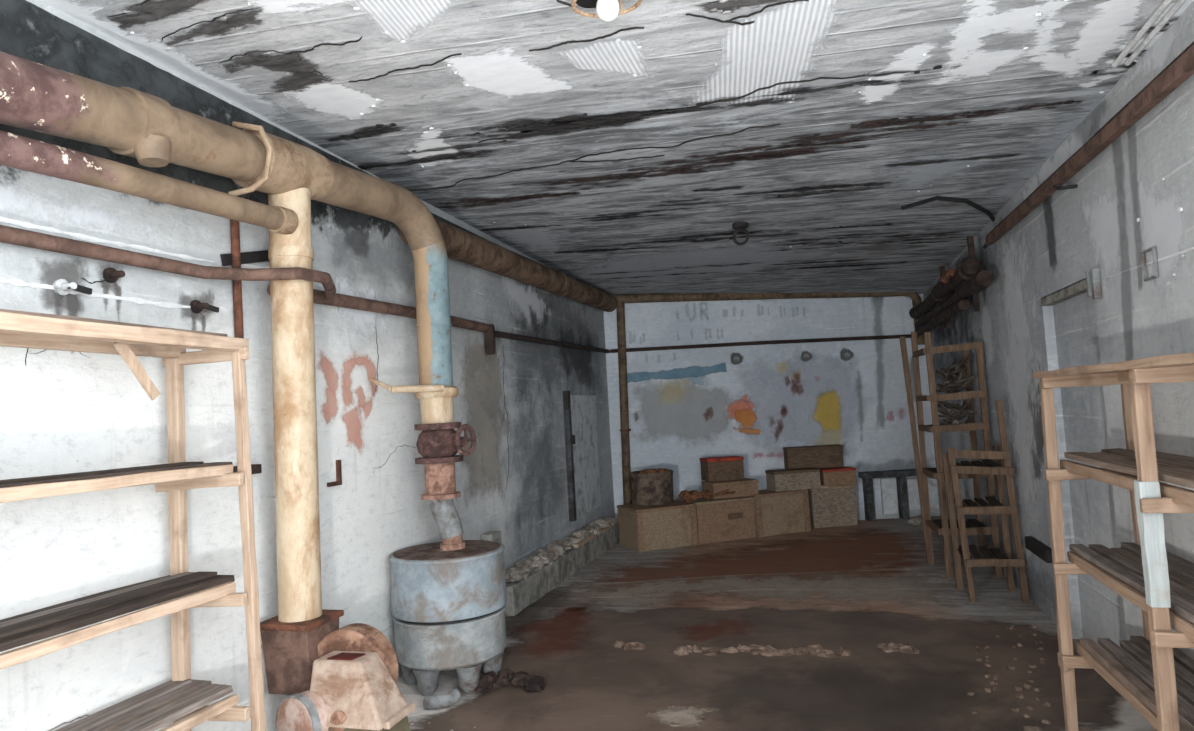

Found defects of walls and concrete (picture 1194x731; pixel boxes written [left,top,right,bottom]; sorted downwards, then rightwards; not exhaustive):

crack [686,0,809,26]
crack [285,37,362,55]
crack [349,53,461,82]
crack [529,27,644,51]
damp [361,70,947,169]
damp [435,101,1083,209]
damp [482,182,890,231]
crack [1103,247,1194,279]
damp [465,342,504,493]
damp [410,590,1123,731]